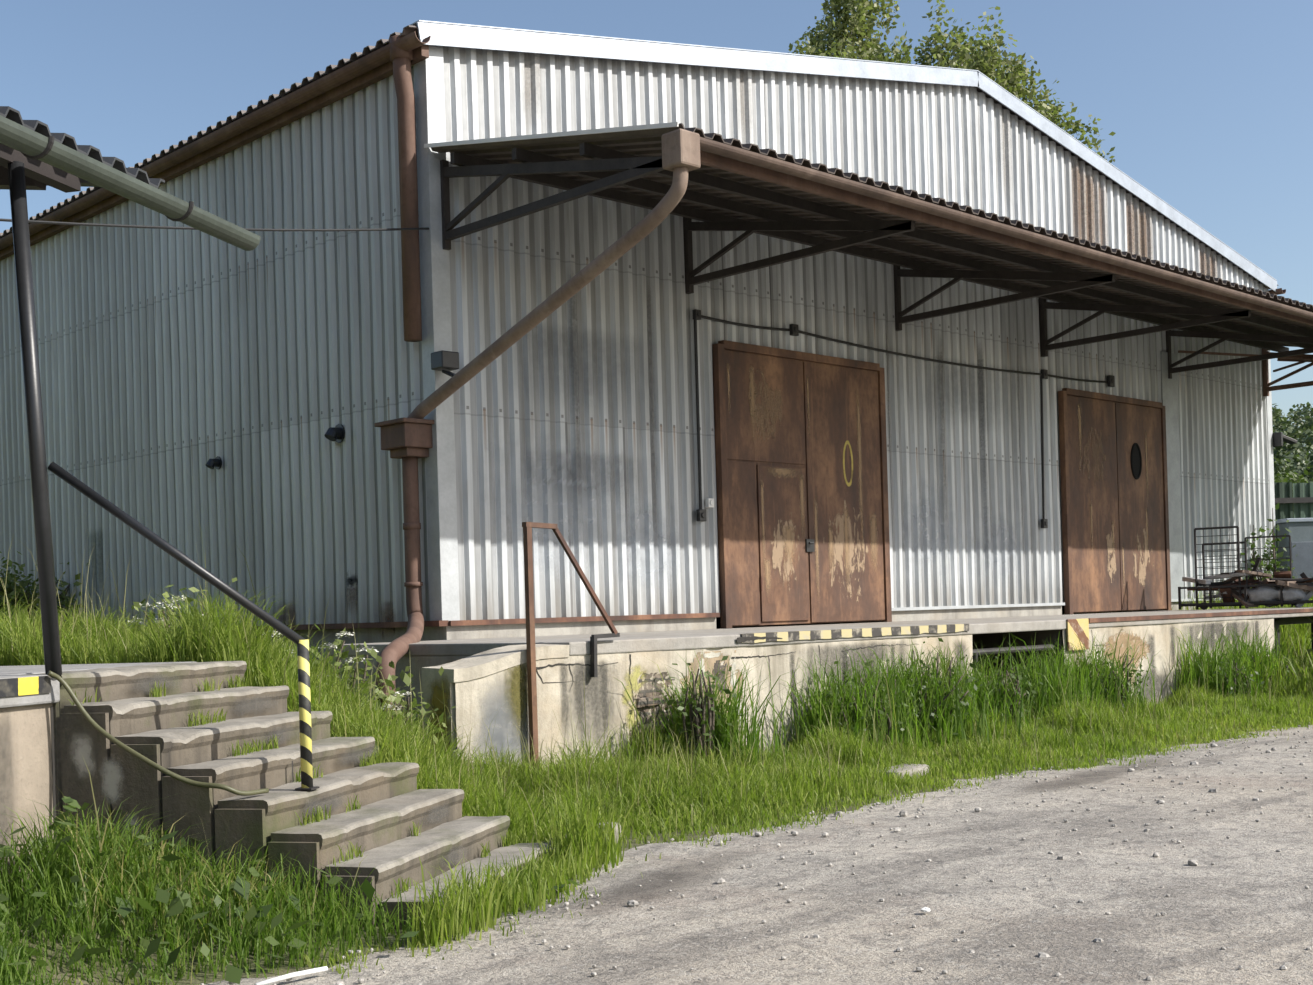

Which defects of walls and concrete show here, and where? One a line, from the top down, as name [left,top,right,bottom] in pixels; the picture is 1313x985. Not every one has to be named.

rust [1075,171,1102,237]
peeling [761,401,876,601]
water stain [484,669,528,760]
water stain [562,665,612,738]